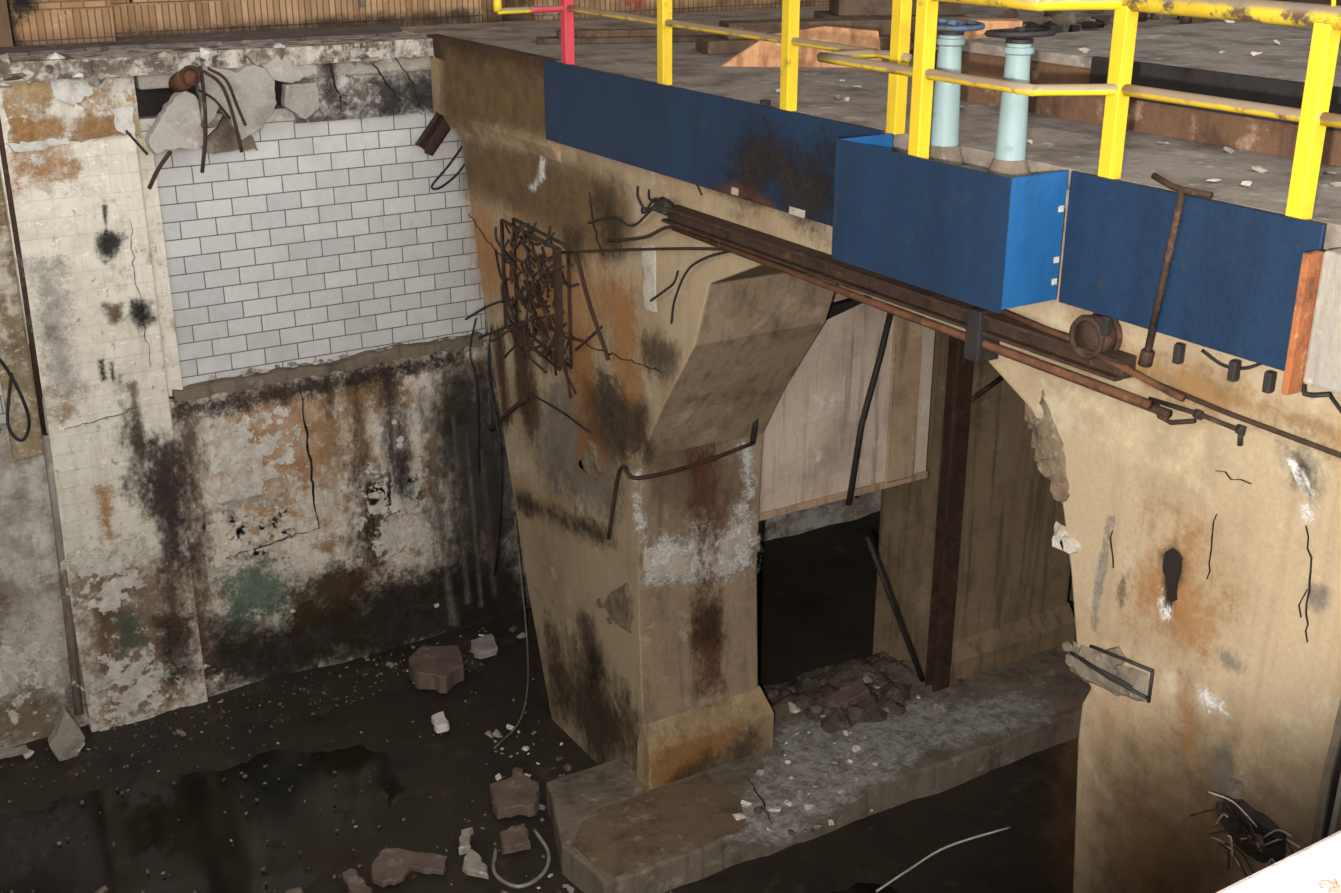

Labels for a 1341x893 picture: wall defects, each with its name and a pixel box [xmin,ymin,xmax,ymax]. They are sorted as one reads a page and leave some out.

spalling [2,76,141,152]
spalling [201,115,258,154]
spalling [294,63,433,124]
spalling [1024,389,1070,504]
water stain [59,369,531,729]
spalling [596,581,635,634]
peeling [643,523,754,587]
spalling [1052,522,1082,554]
corrosion [1149,547,1198,639]
crack [1298,526,1326,643]
spalling [1189,778,1300,877]